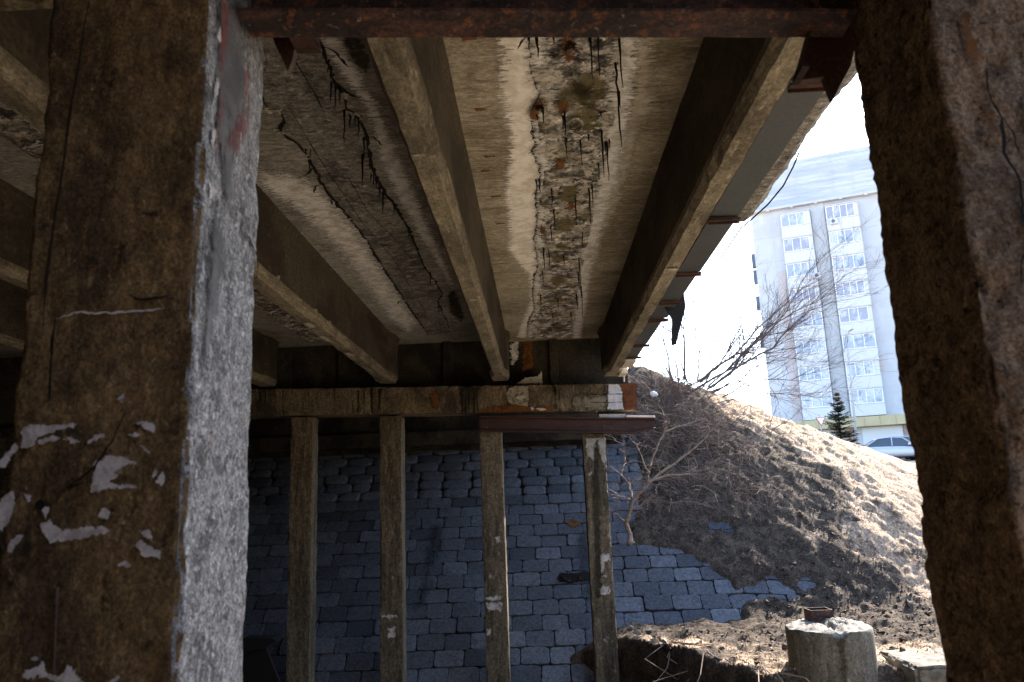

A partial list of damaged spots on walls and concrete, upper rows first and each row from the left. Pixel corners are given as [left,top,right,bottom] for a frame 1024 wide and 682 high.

damp [587,37,660,275]
crack [262,38,455,335]
spalling [523,37,650,339]
corrosion [620,383,638,410]
peeling [0,423,105,469]
peeling [128,420,155,453]
peeling [90,455,137,493]
peeling [152,469,165,486]
peeling [0,491,32,553]
peeling [39,507,115,544]
peeling [135,529,161,559]